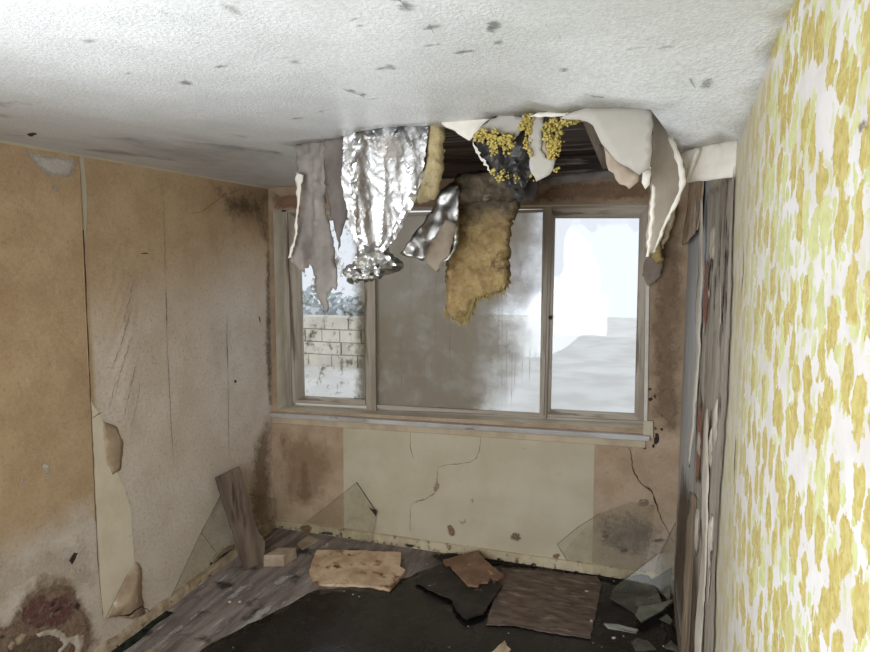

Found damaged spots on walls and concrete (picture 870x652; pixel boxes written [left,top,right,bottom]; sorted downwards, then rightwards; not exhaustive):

flaking render [442,118,492,141]
peeling [642,168,651,189]
flaking render [703,225,715,337]
leakage [643,236,679,449]
leakage [0,552,93,652]
flaking render [91,402,135,619]
leakage [111,611,174,652]
crack [410,438,481,534]
leakage [484,558,626,584]
crack [628,448,673,541]
leakage [674,471,698,652]
peeling [694,508,714,569]